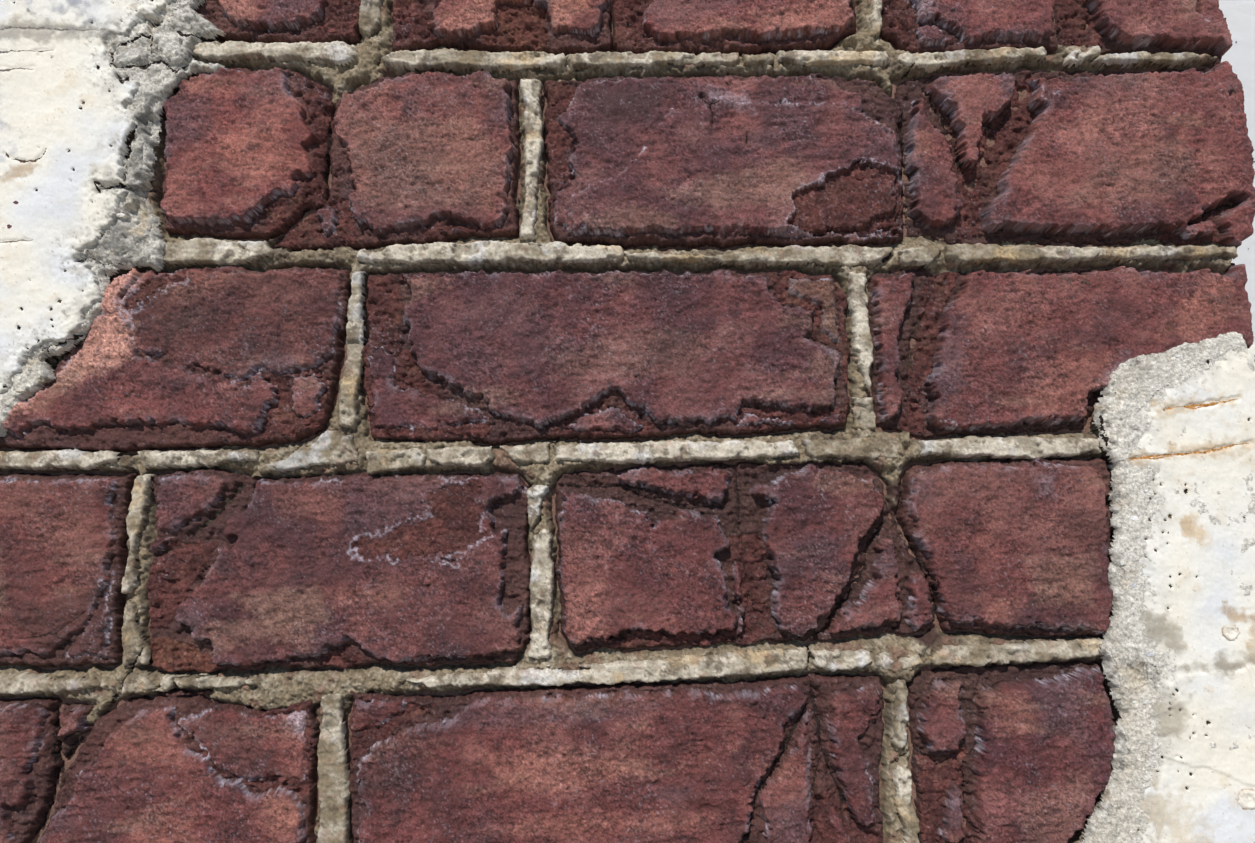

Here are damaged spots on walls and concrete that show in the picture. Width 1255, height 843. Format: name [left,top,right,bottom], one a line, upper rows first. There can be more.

spalling [305,0,361,42]
spalling [1054,0,1104,48]
spalling [81,91,159,285]
spalling [788,161,904,237]
spalling [936,72,1037,244]
spalling [0,339,60,410]
rust [1165,444,1227,458]
spalling [351,480,488,561]
spalling [1087,332,1246,843]
crack [103,642,151,716]
crack [34,708,79,838]
spalling [176,700,315,796]